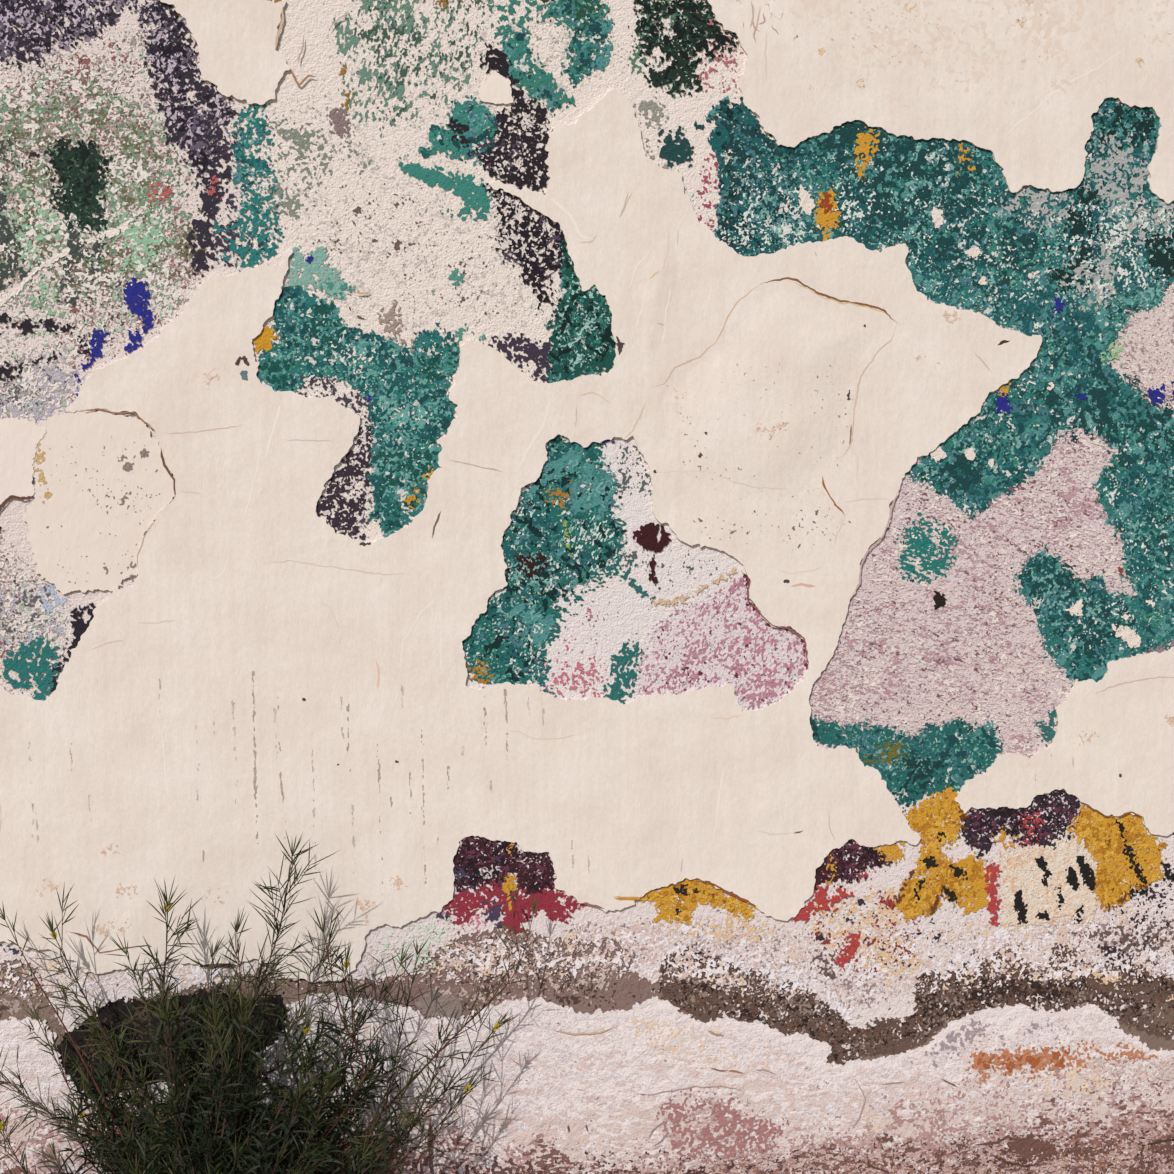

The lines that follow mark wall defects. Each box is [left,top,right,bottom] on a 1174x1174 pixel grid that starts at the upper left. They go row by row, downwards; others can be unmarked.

crack [974,340,1009,371]
peeling [0,0,1174,815]
crack [777,282,896,588]
peeling [0,961,59,1030]
peeling [286,927,1174,1066]
spalling [1007,1132,1099,1161]
spalling [1128,1134,1174,1174]